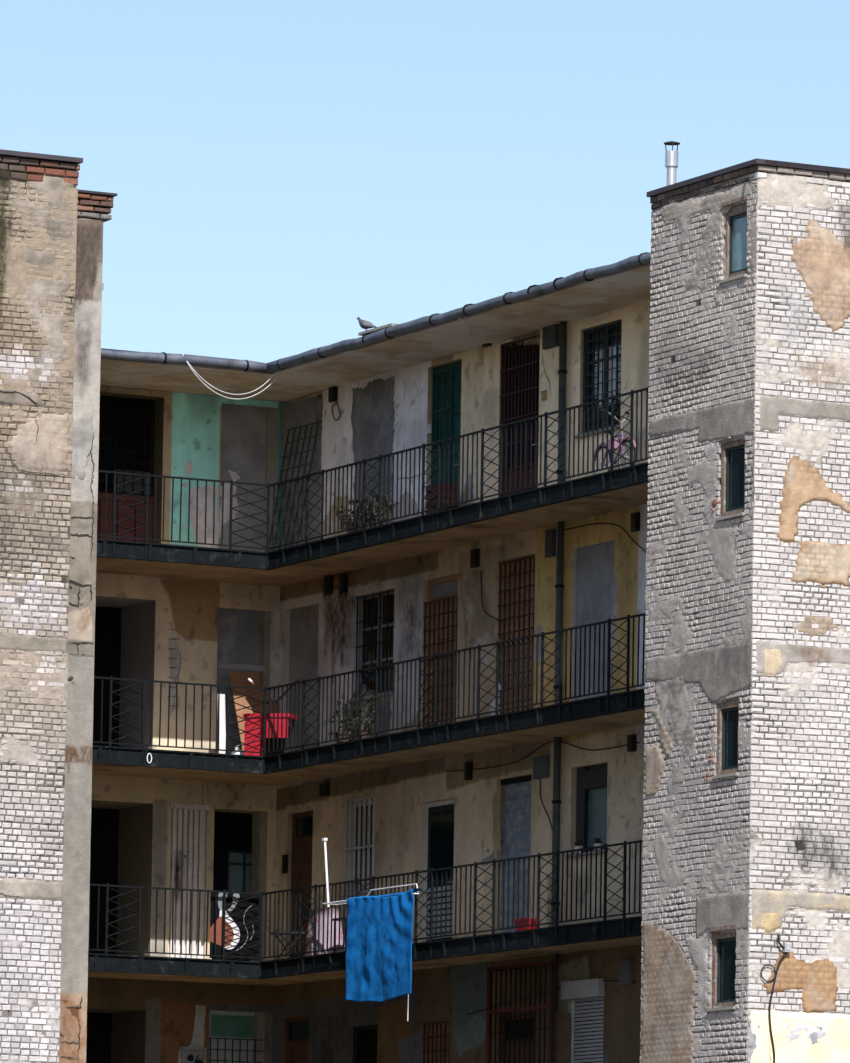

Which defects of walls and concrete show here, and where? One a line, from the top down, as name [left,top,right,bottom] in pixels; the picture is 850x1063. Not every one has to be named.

leakage [0,169,11,295]
flaking render [790,220,850,332]
crack [0,390,41,439]
crack [7,431,95,606]
flaking render [775,455,850,589]
peeling [178,1005,206,1063]
flaking render [640,920,760,1063]
flaking render [763,950,838,1046]